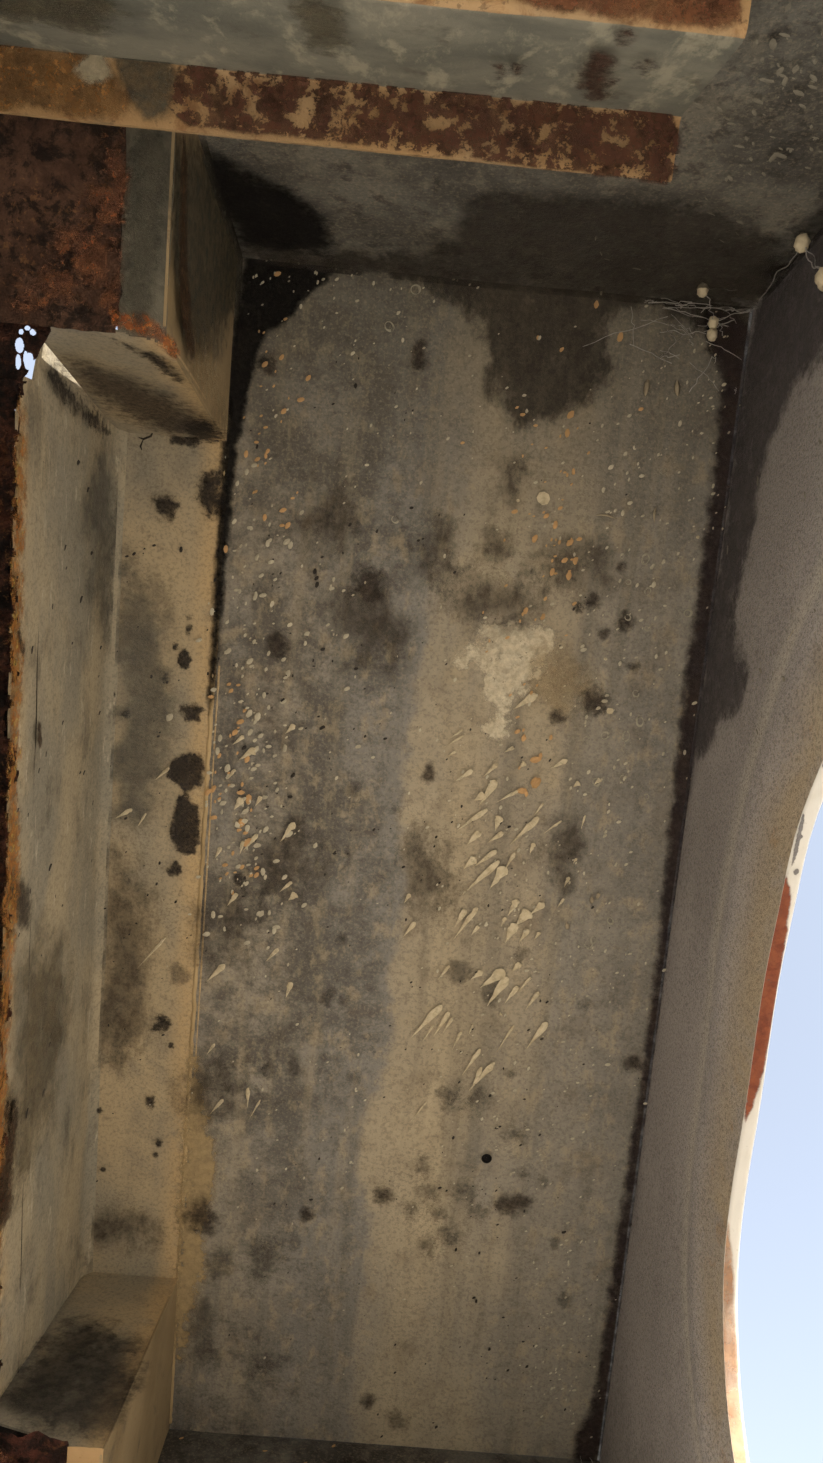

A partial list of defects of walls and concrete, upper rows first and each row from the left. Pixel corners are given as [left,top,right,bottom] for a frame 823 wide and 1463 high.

corrosion [523,0,741,30]
corrosion [0,45,680,359]
corrosion [243,330,311,467]
corrosion [515,406,579,458]
corrosion [263,491,298,529]
corrosion [511,468,582,580]
corrosion [0,401,42,1247]
water stain [166,753,205,877]
corrosion [204,709,259,895]
water stain [394,229,823,1462]
corrosion [745,878,791,1120]